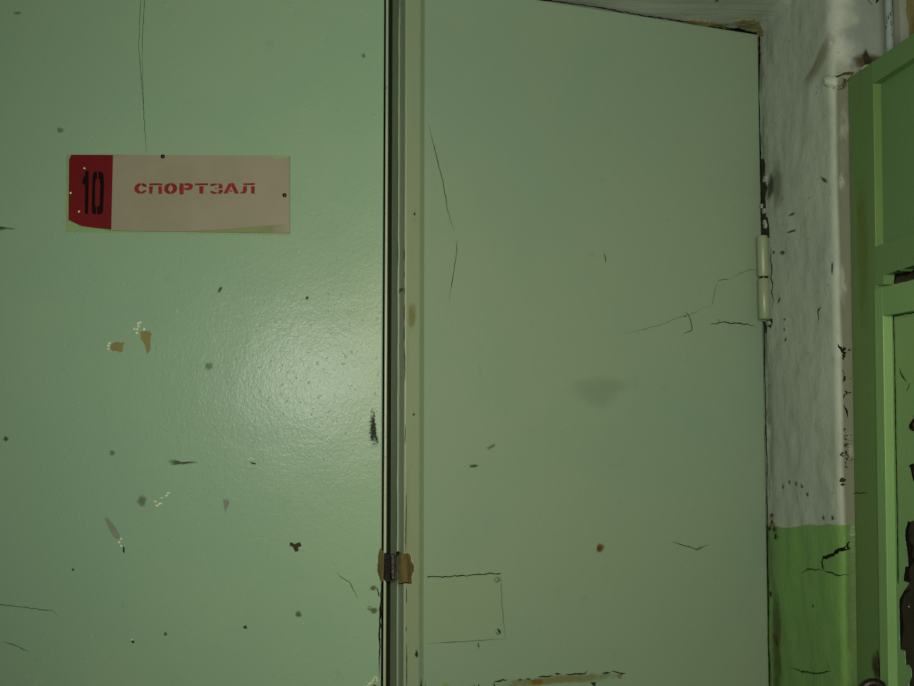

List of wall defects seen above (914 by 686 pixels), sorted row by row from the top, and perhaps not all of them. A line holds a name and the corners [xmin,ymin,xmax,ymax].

flaking render [683,18,765,36]
flaking render [906,0,914,36]
crack [138,0,147,151]
peeling [107,341,125,352]
peeling [133,321,152,354]
crack [633,269,829,686]
crack [802,542,854,576]
peeling [899,519,914,686]